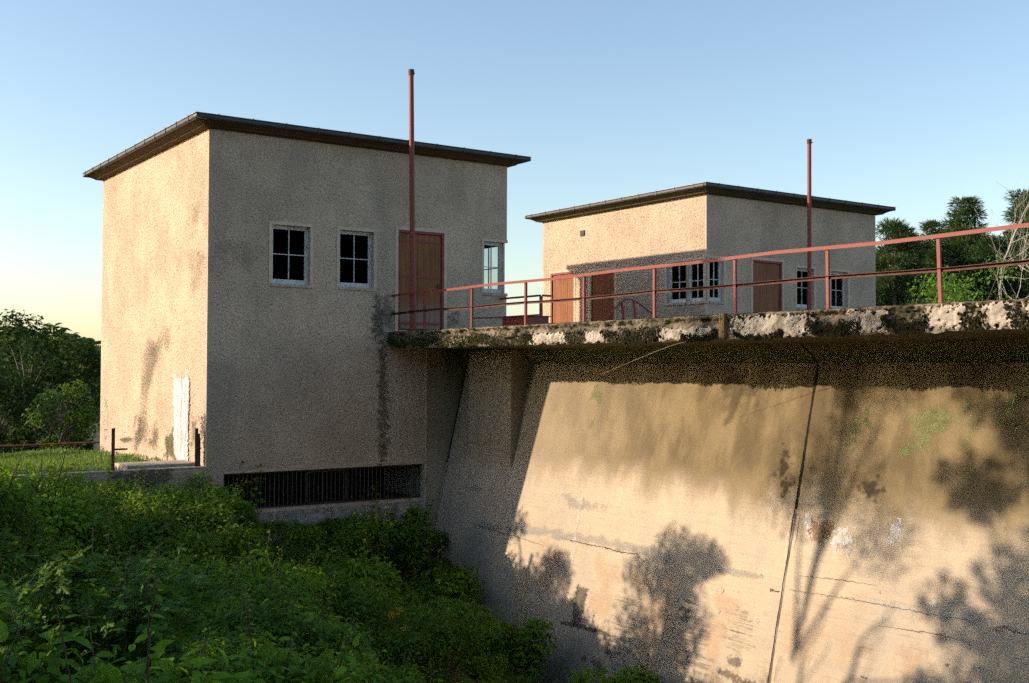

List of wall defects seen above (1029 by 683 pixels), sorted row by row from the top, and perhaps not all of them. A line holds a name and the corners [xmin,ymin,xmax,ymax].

damp [371,294,390,466]
rust [808,520,834,542]
damp [560,584,618,675]